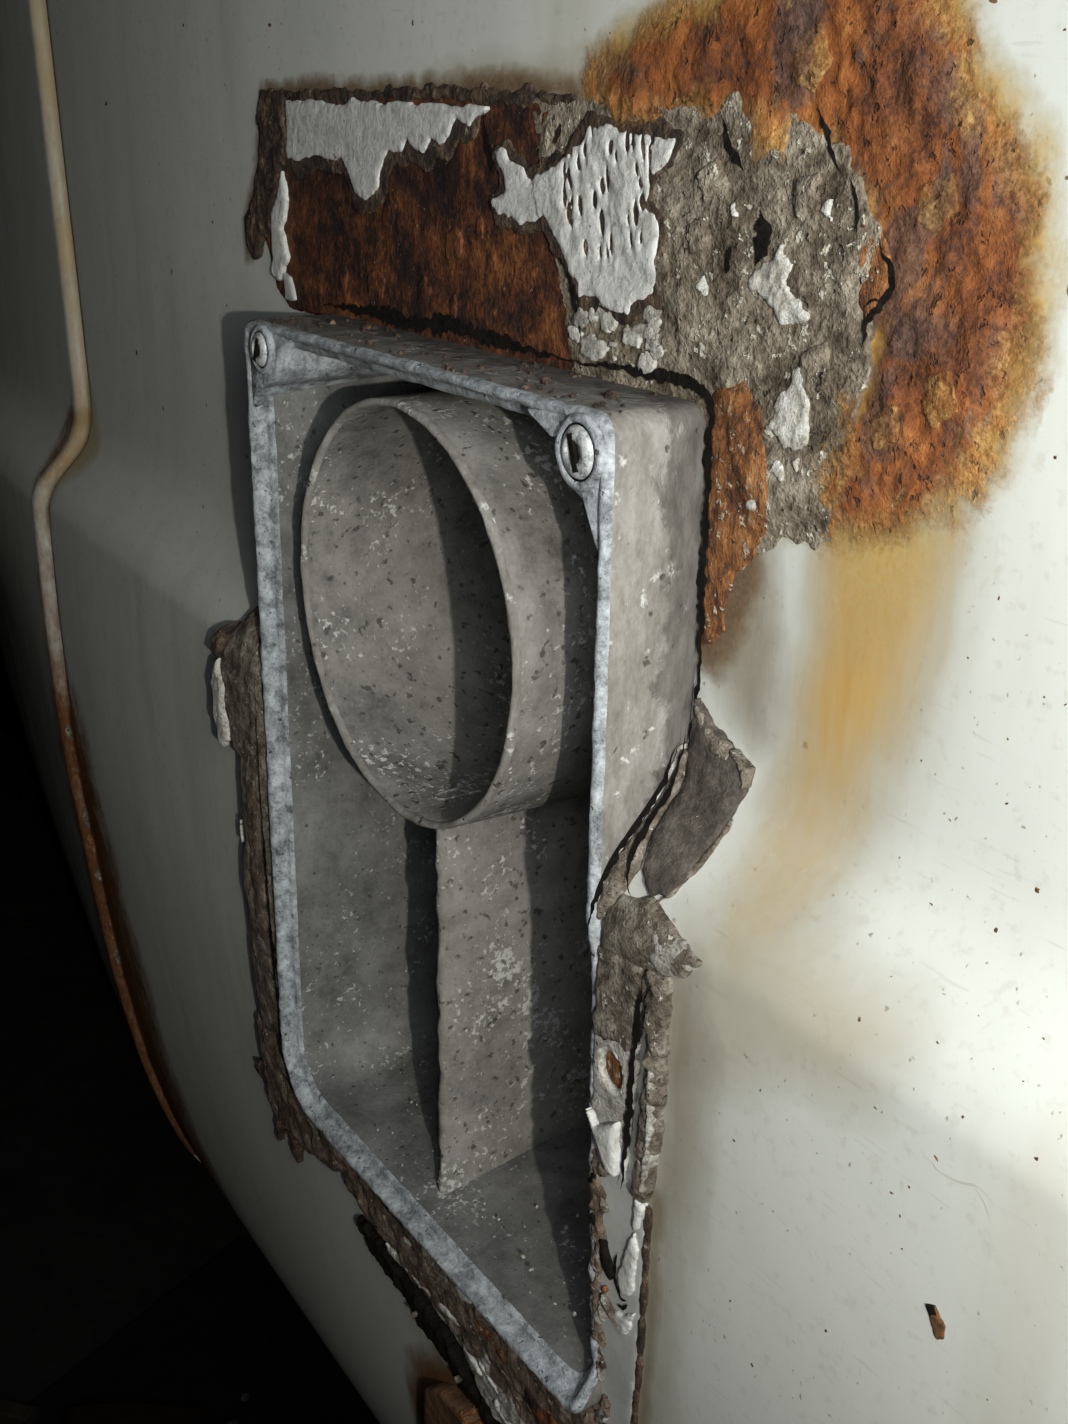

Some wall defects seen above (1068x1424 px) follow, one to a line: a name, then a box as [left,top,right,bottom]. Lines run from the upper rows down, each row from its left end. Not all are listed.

peeling [271,97,490,301]
peeling [489,111,684,374]
peeling [695,276,708,296]
peeling [686,157,729,254]
peeling [748,244,810,325]
peeling [792,172,833,221]
crack [816,103,895,353]
peeling [765,342,831,482]
corrosion [582,0,1068,833]
corrosion [411,1358,483,1424]